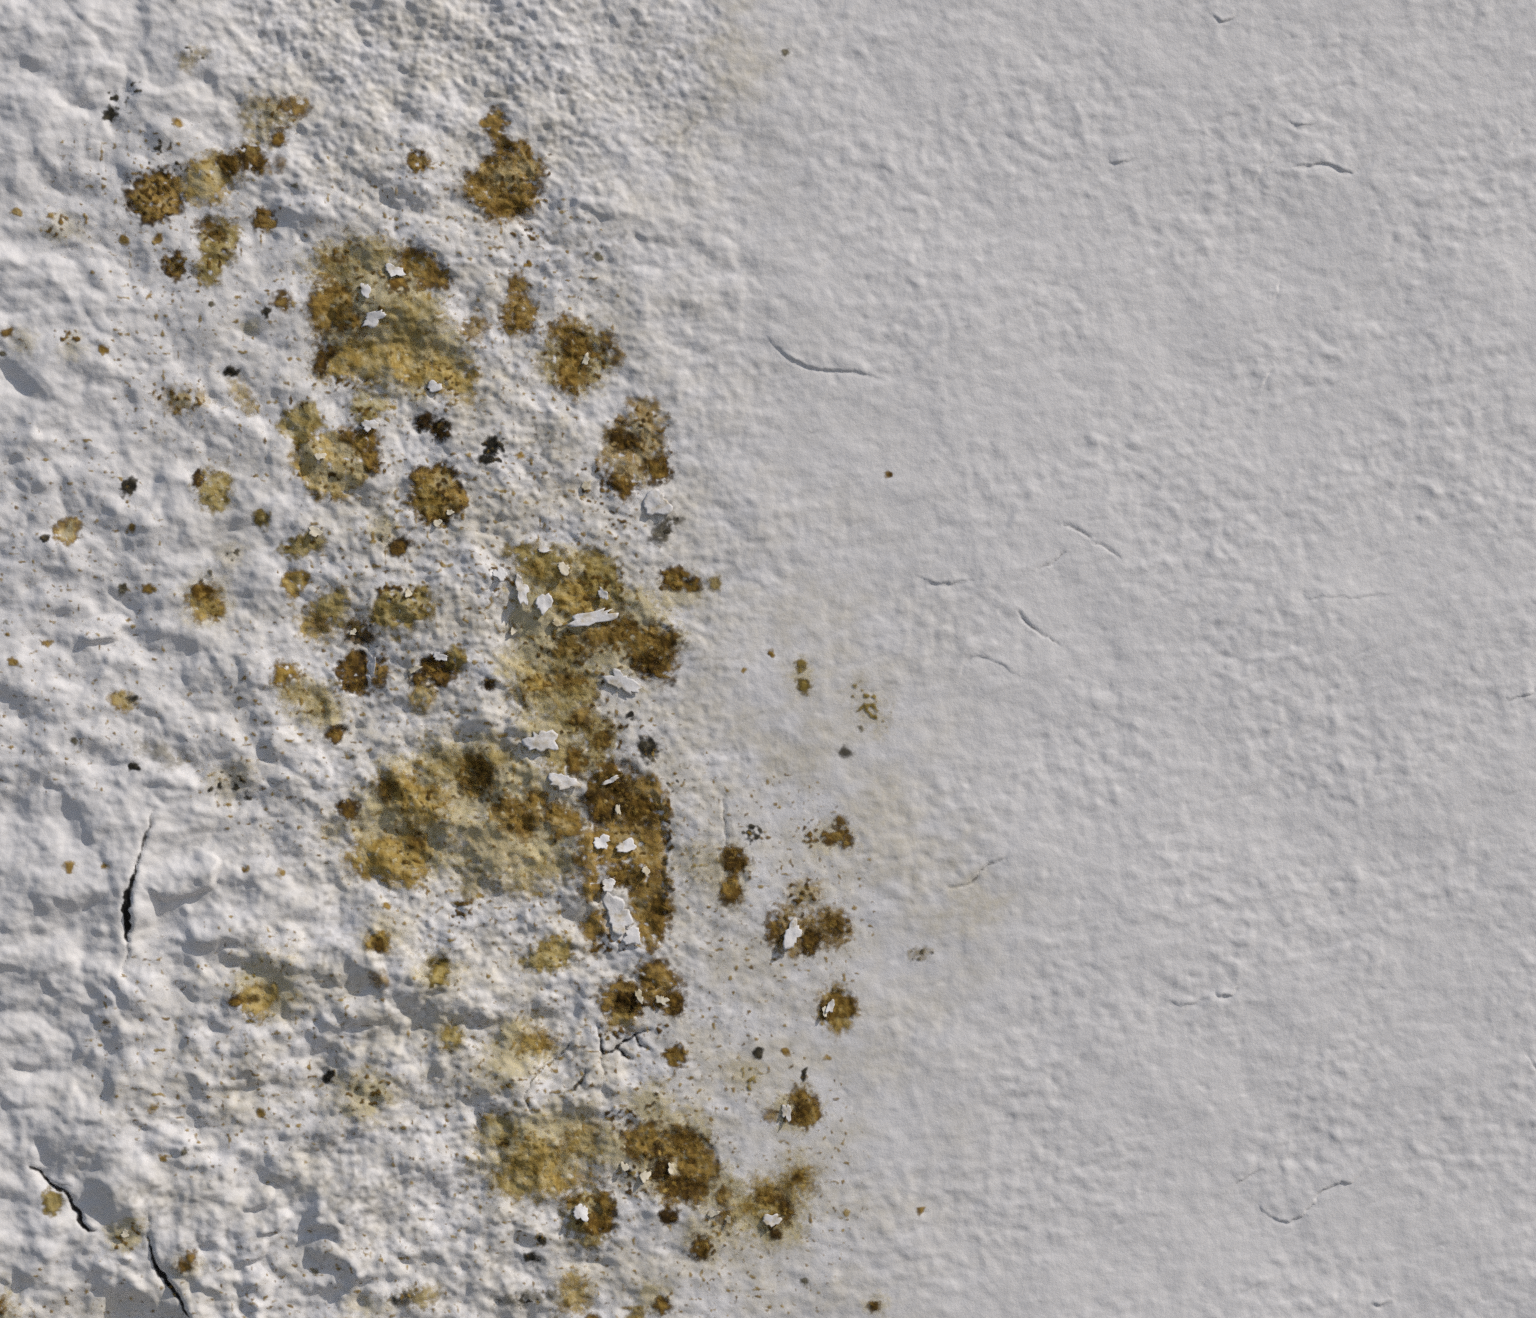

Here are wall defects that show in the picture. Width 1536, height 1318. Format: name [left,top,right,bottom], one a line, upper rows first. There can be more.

damp [36,82,875,1318]
damp [852,684,884,731]
crack [121,826,151,939]
crack [29,1166,93,1232]
crack [148,1237,189,1317]